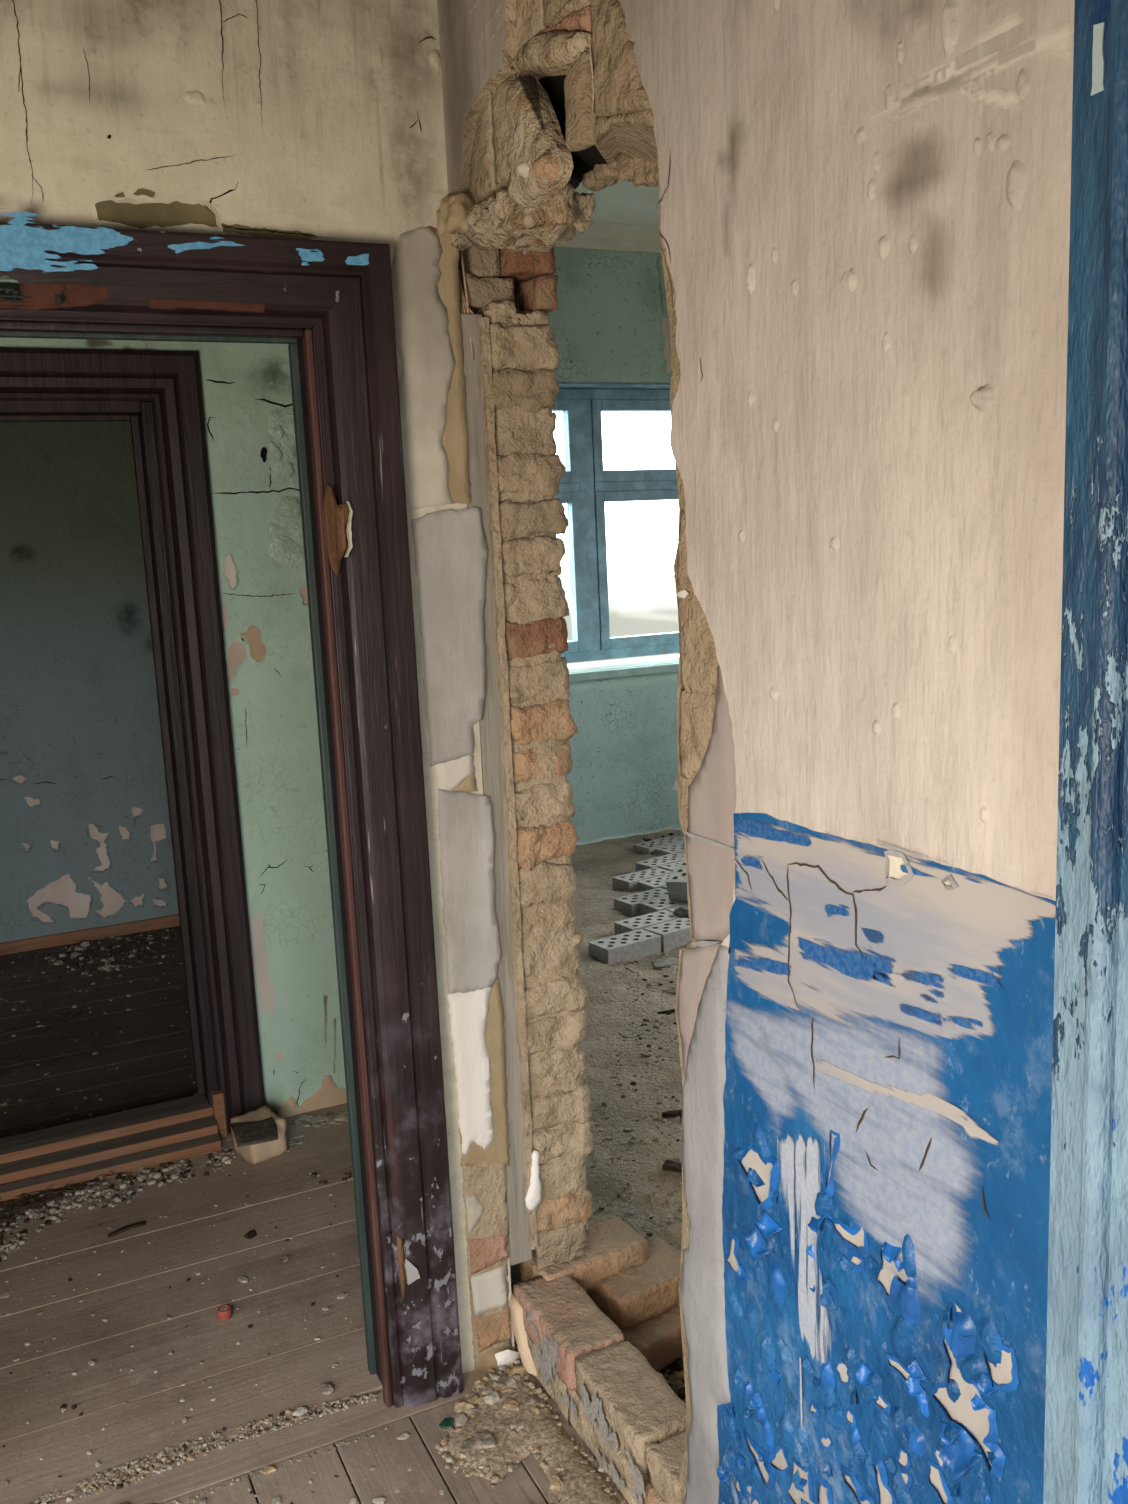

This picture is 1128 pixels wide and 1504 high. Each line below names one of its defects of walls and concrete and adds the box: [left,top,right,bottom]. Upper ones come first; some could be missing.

crack [12,0,44,203]
crack [219,0,262,120]
water stain [900,20,1069,104]
peeling [0,186,340,309]
crack [148,155,322,237]
peeling [345,254,369,265]
peeling [220,551,269,699]
spalling [391,0,659,1504]
peeling [20,805,170,925]
crack [736,860,886,1084]
peeling [676,509,1056,1310]
peeling [717,1298,1019,1504]